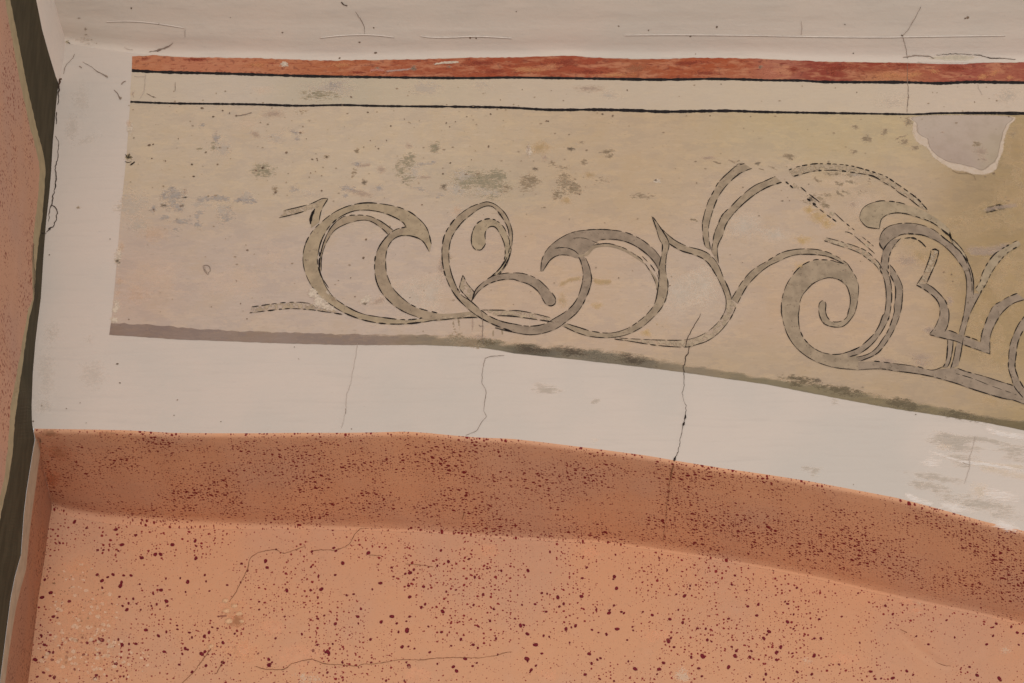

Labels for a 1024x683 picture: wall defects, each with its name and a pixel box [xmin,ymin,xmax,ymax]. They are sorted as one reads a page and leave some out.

crack [865,7,1015,107]
leakage [340,141,440,198]
leakage [436,144,605,202]
peeling [909,115,1015,180]
crack [467,311,503,435]
crack [663,314,701,537]
leakage [782,374,862,397]
leakage [886,397,917,411]
leakage [939,409,992,422]